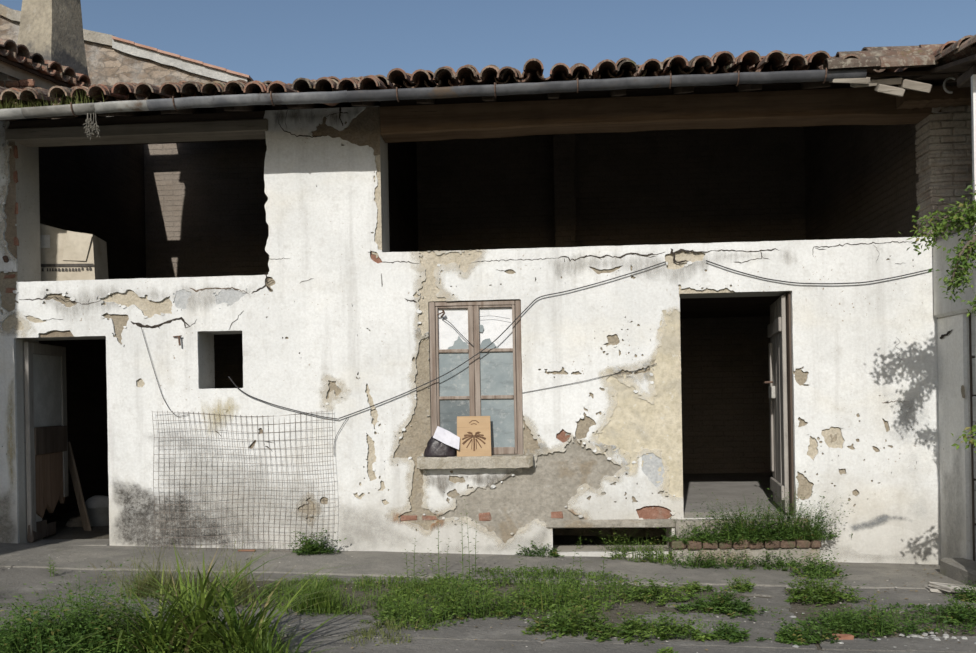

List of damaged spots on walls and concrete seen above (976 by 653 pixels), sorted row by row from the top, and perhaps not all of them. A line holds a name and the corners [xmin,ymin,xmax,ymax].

peeling [308,107,382,263]
peeling [0,121,77,337]
crack [472,248,777,281]
crack [813,241,908,264]
peeling [101,289,192,344]
crack [131,317,196,328]
peeling [321,375,347,409]
peeling [354,250,683,546]
peeling [793,367,808,386]
peeling [807,427,859,460]
peeling [795,471,818,501]
water stain [117,485,227,547]